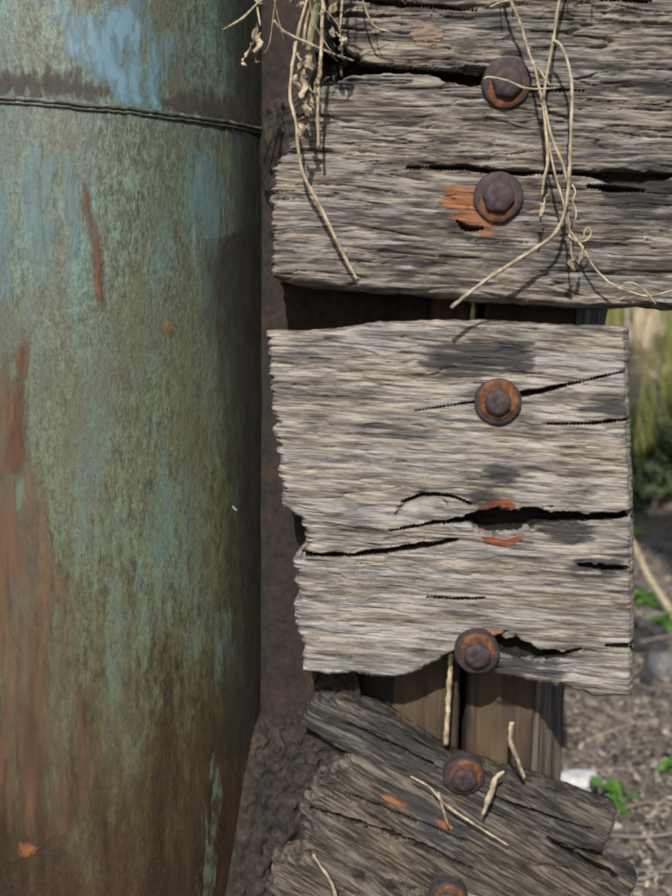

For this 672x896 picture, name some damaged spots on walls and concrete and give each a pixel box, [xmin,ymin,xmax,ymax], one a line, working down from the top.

crack [599,0,651,8]
crack [408,165,672,193]
corrosion [438,185,517,234]
crack [520,371,624,397]
crack [416,401,474,411]
crack [547,418,626,426]
crack [403,492,470,505]
crack [305,538,456,557]